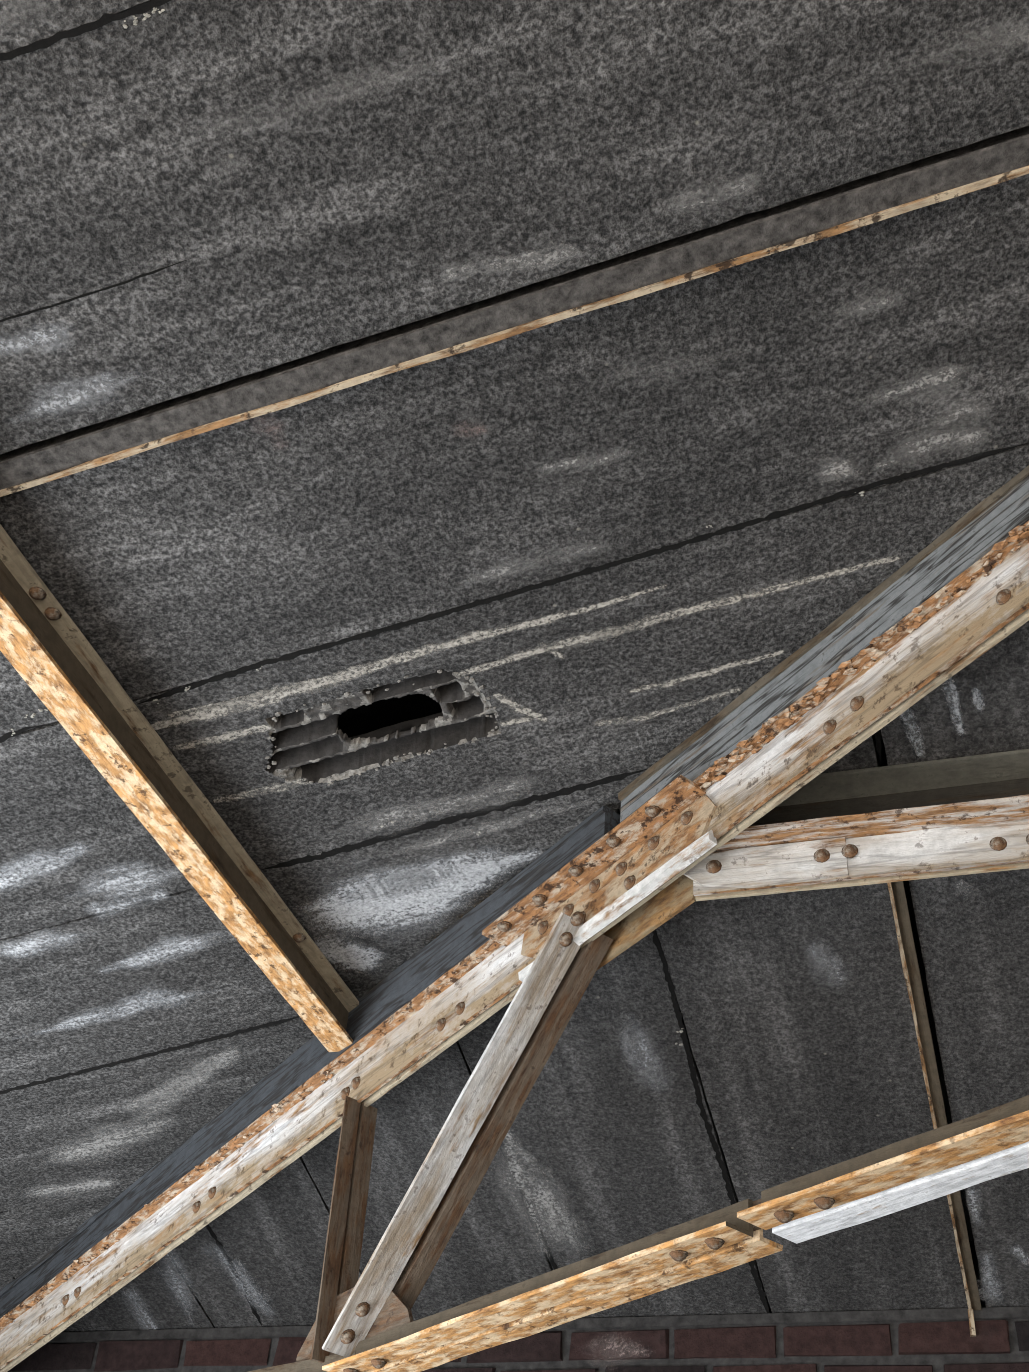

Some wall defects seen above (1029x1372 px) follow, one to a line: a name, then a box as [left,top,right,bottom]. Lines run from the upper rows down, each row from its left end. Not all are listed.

leakage [543,454,622,470]
hole [265,669,501,786]
leakage [150,584,666,750]
leakage [597,688,740,726]
leakage [457,556,900,676]
leakage [630,650,784,692]